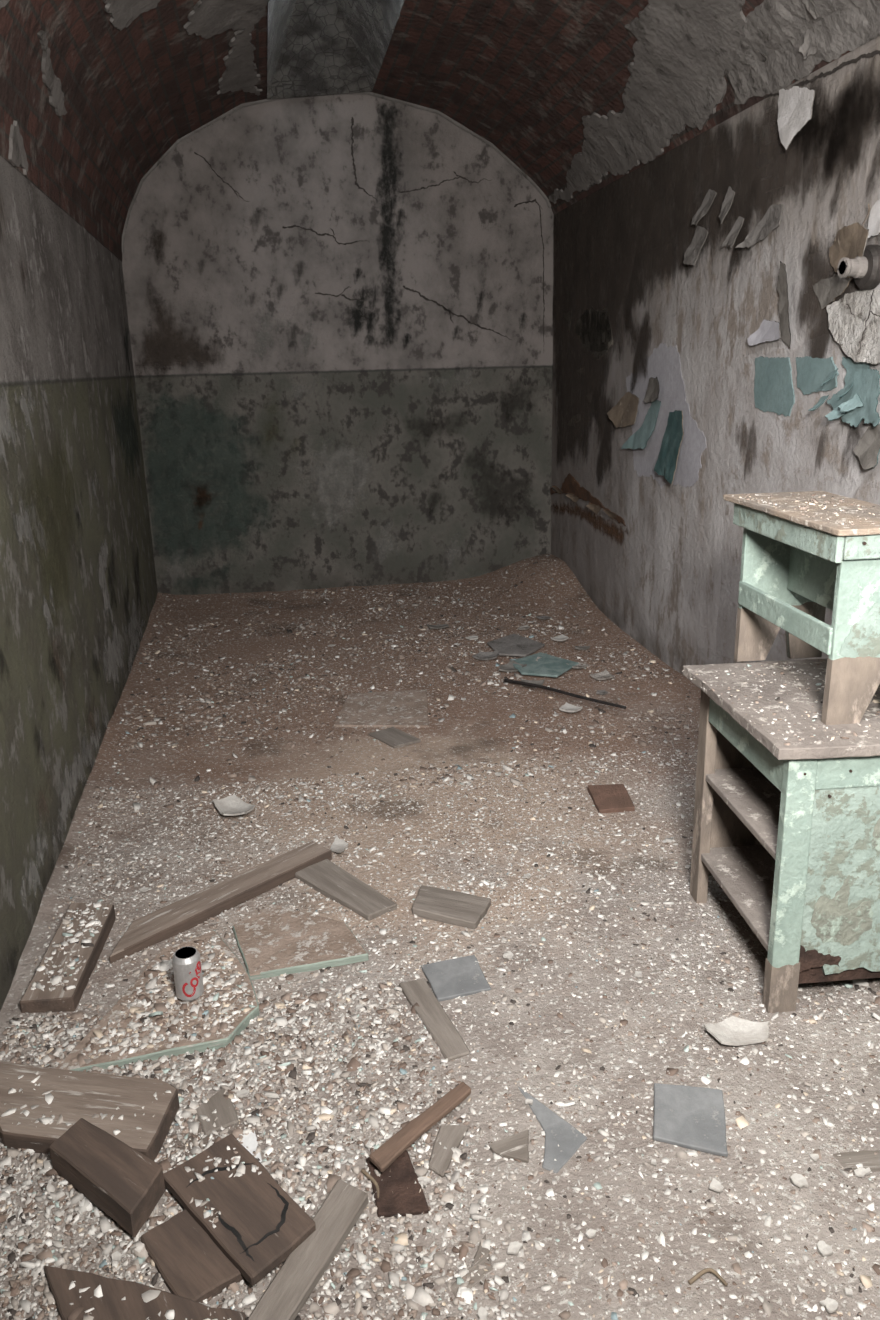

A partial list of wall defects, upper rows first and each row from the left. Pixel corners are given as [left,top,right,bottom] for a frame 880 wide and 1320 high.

flaking render [102,0,161,31]
flaking render [183,0,270,96]
flaking render [549,0,880,204]
crack [763,50,880,99]
crack [351,117,491,199]
crack [282,225,367,245]
water stain [351,104,411,348]
crack [403,286,511,340]
crack [514,199,545,353]
flaking render [683,186,784,265]
peeling [607,343,707,488]
peeling [715,199,880,663]